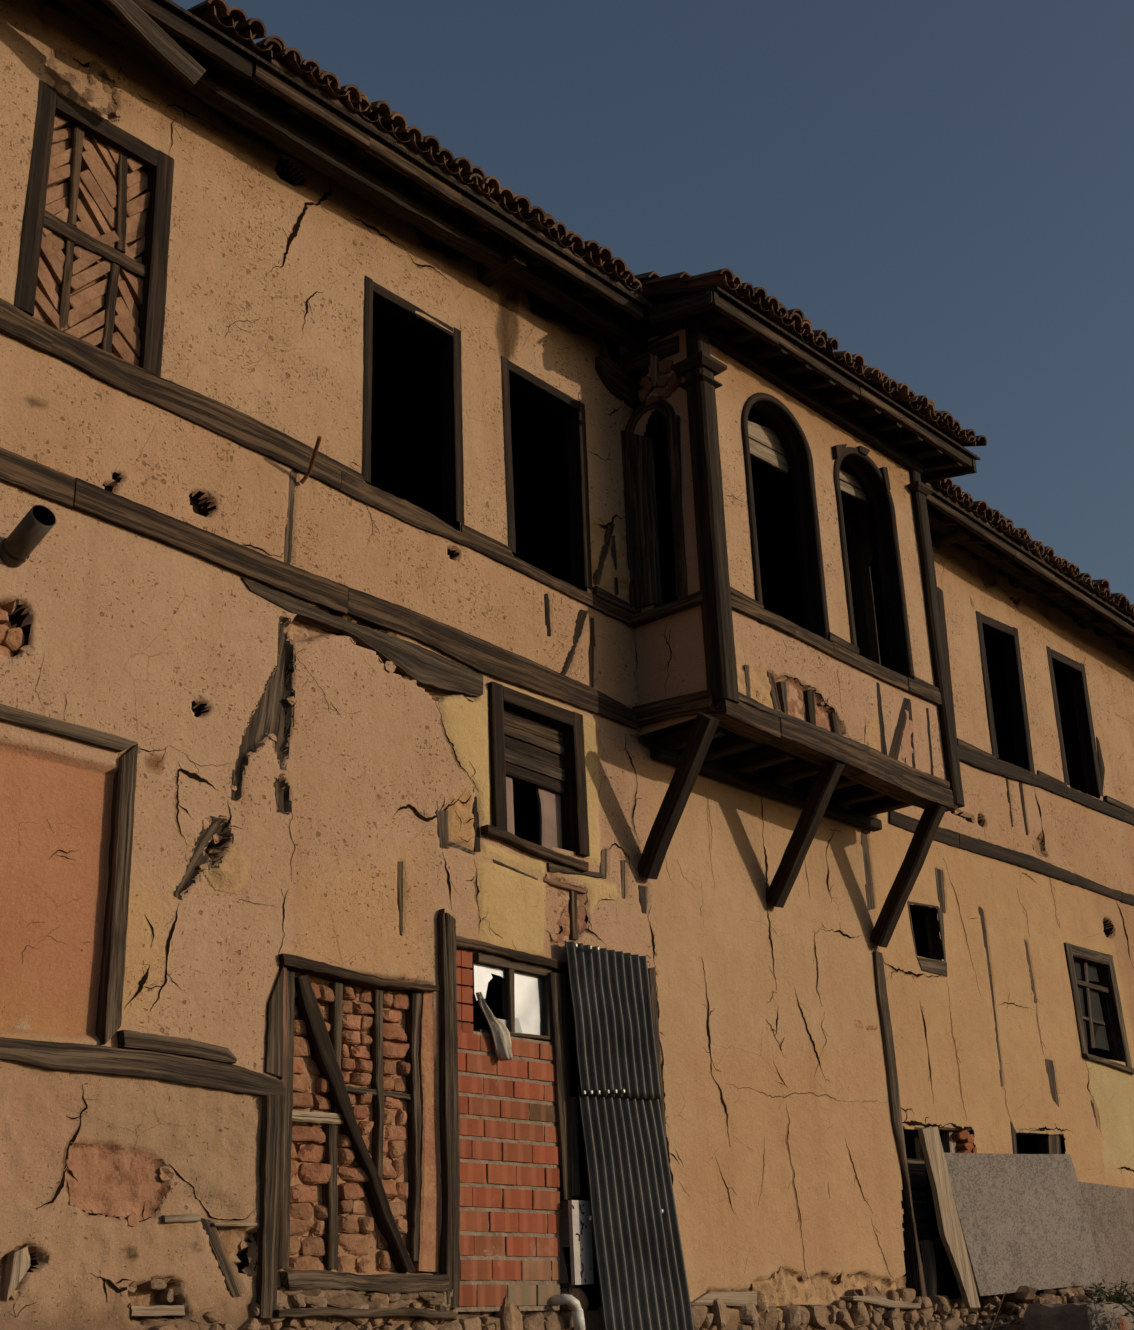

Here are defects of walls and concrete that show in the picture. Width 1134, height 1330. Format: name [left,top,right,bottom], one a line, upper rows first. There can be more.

crack [270,179,451,283]
spalling [230,611,389,814]
spalling [378,657,478,702]
spalling [767,673,843,735]
crack [124,639,341,1012]
spalling [545,873,588,944]
crack [547,895,617,945]
crack [647,908,690,1197]
crack [702,790,1060,1284]
crack [35,1084,158,1225]
spalling [65,1143,174,1227]
spalling [0,1243,39,1302]